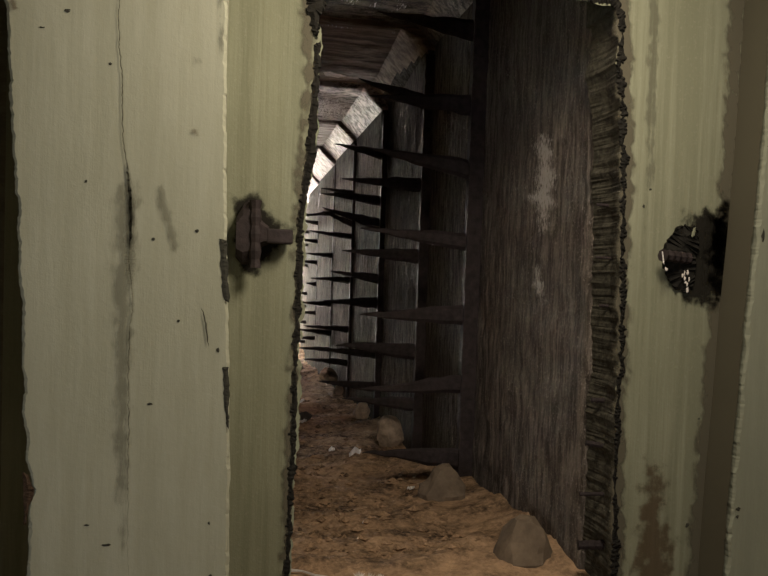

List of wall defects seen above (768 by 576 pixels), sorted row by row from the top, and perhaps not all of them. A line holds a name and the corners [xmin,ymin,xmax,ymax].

crack [118,0,133,570]